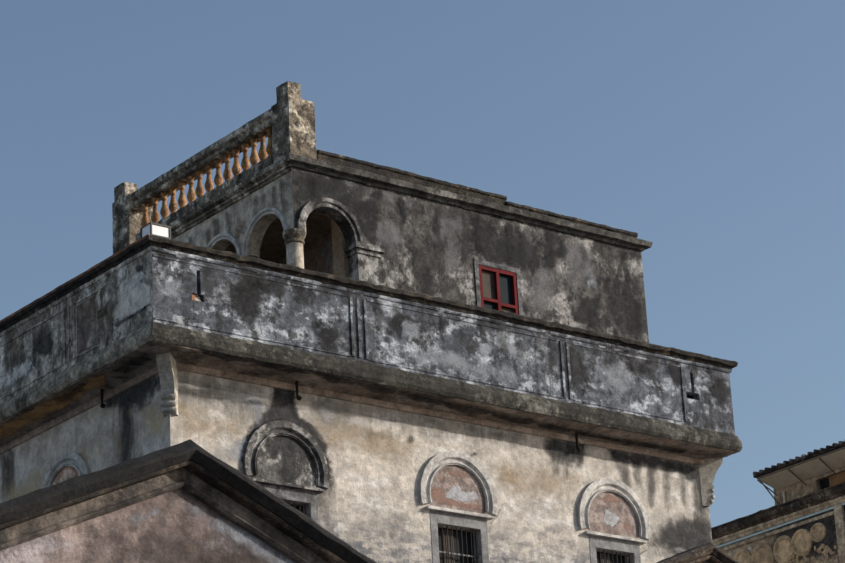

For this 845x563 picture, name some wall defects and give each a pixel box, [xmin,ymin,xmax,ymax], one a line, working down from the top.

water stain [470,215,567,271]
water stain [342,290,447,336]
water stain [571,251,643,340]
water stain [4,312,52,371]
water stain [563,341,598,389]
water stain [613,347,655,377]
water stain [667,360,728,403]
water stain [105,375,163,462]
water stain [242,388,363,502]
water stain [544,438,587,464]
peeling [431,471,482,509]
peeling [603,494,630,530]